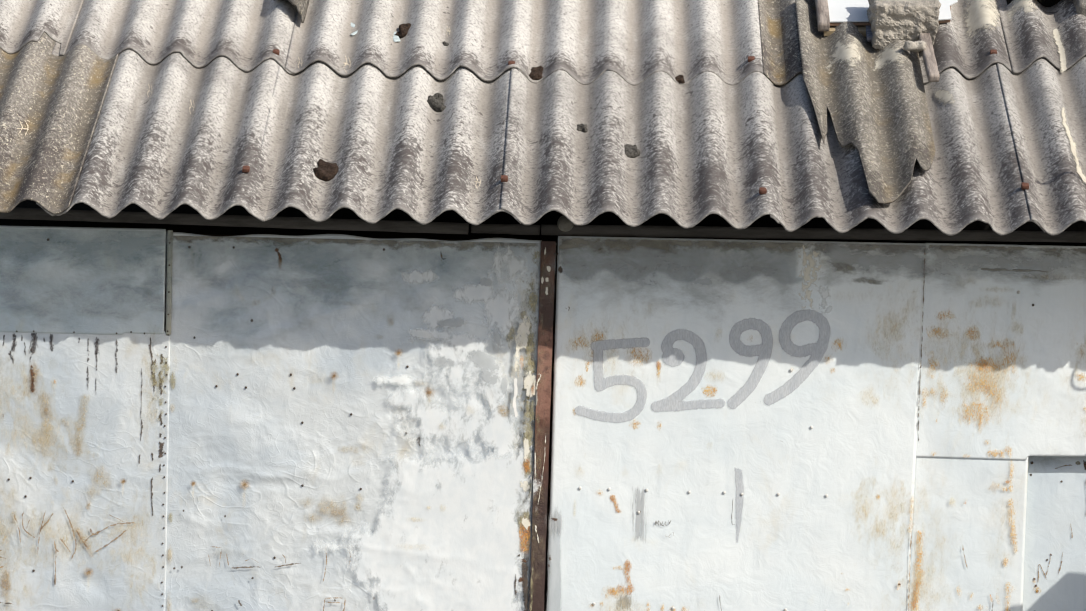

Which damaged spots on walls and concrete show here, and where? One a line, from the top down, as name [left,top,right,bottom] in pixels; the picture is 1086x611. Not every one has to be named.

corrosion [30,365,51,440]
corrosion [964,342,1015,429]
corrosion [987,443,1017,566]
corrosion [592,562,633,609]
corrosion [909,505,923,611]